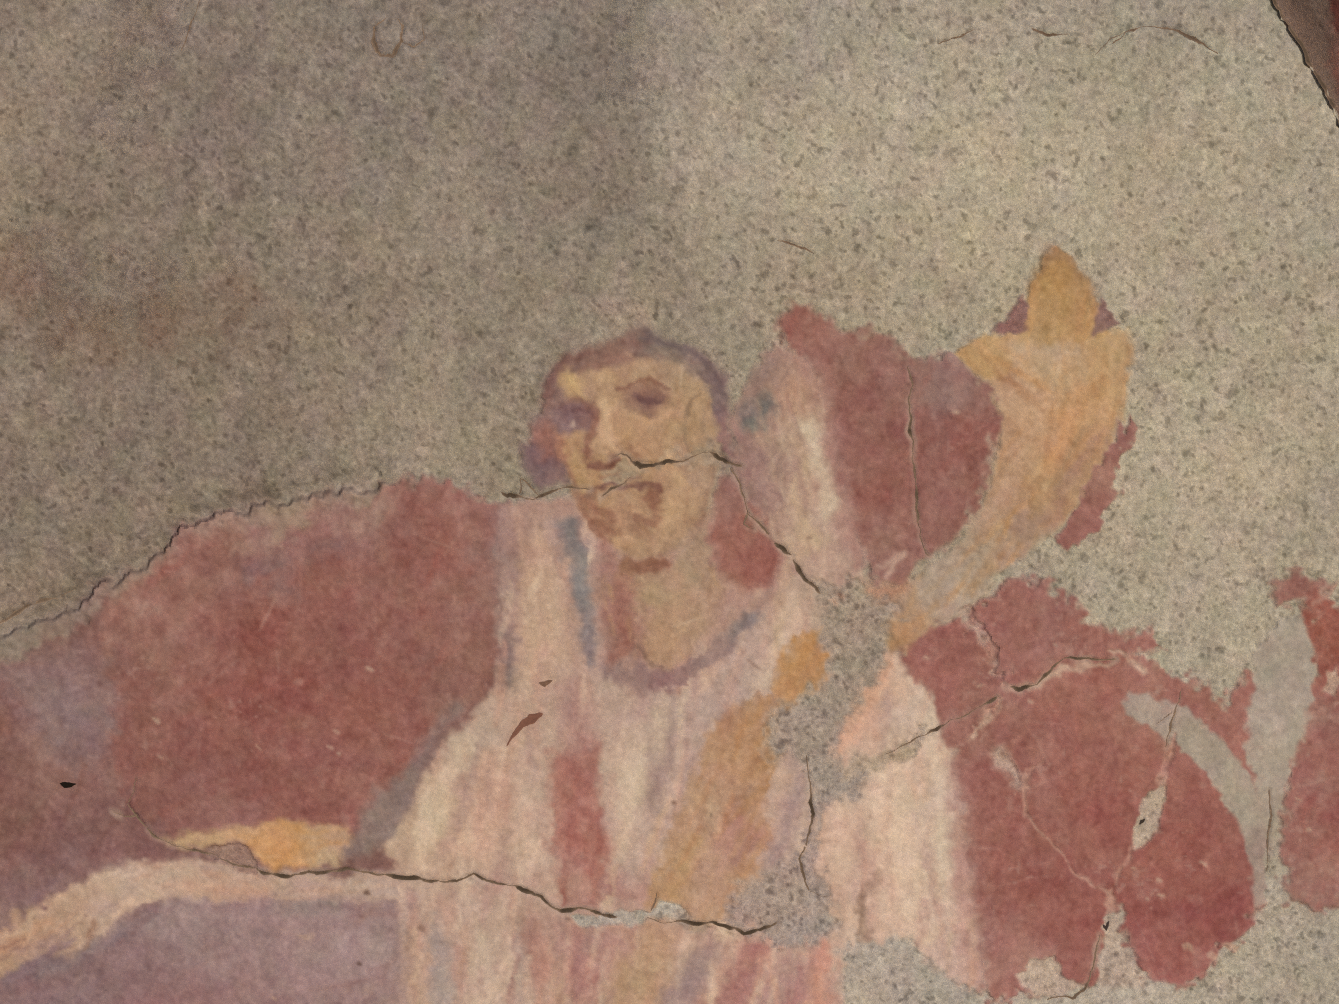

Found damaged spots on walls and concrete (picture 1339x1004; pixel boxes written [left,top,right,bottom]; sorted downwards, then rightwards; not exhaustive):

spalling [0,0,1339,711]
crack [501,451,821,594]
crack [887,656,1116,754]
spalling [723,435,1339,1004]
crack [1157,691,1181,740]
crack [114,777,777,936]
crack [799,755,825,897]
crack [1047,935,1100,1000]